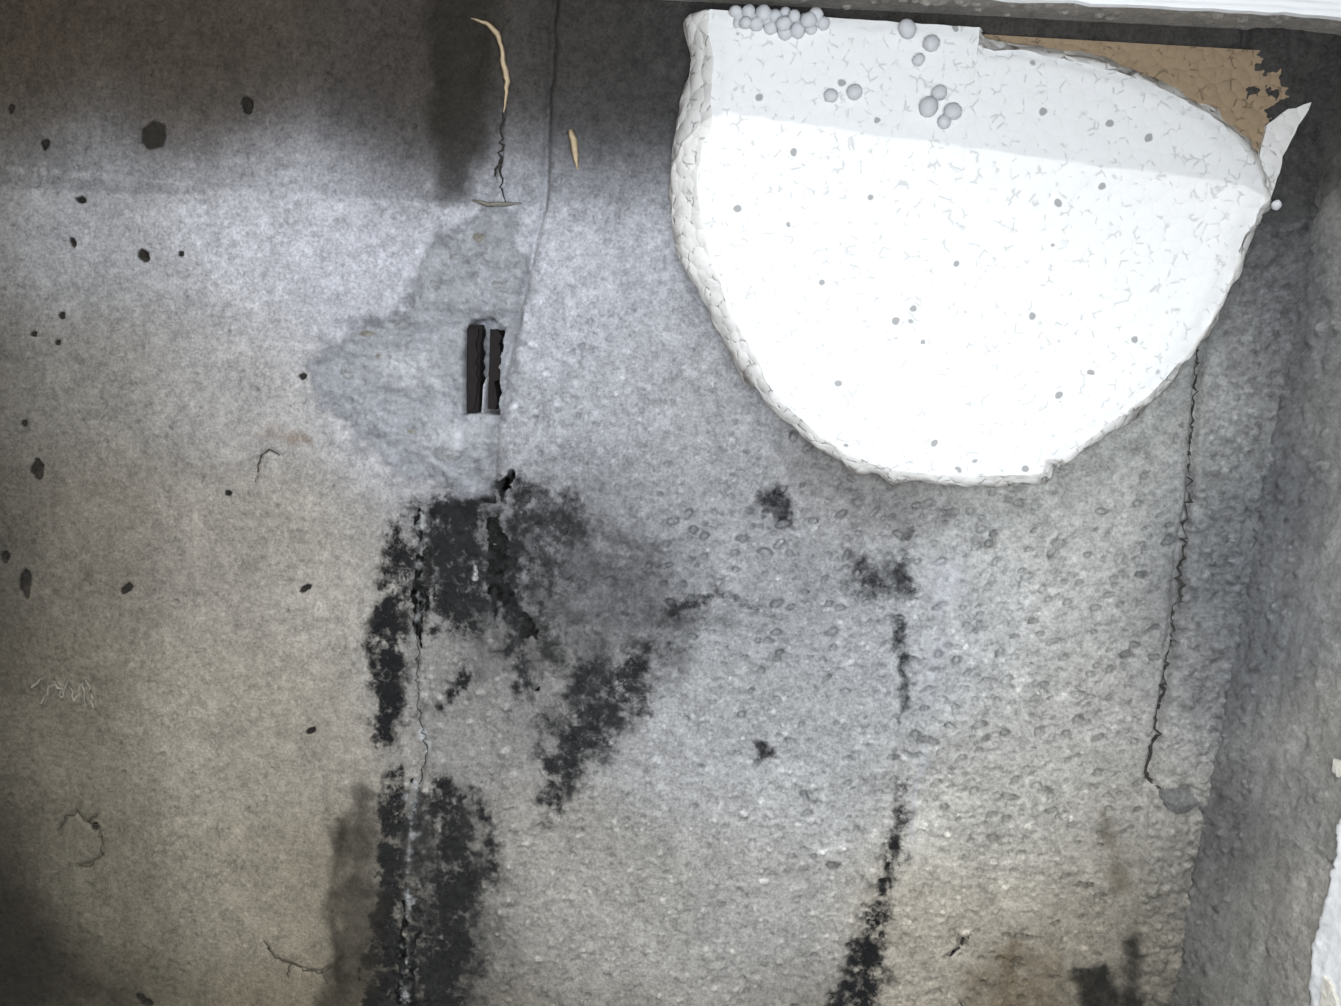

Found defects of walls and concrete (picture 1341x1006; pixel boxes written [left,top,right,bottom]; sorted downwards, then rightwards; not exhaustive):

crack [494,109,506,202]
spalling [299,199,534,496]
damp [323,765,497,1006]
crack [412,515,433,813]
damp [361,478,718,810]
damp [827,784,917,1006]
damp [1072,938,1141,1006]
crack [1143,349,1200,790]
peeling [1308,818,1341,1006]
peeling [1332,759,1341,778]